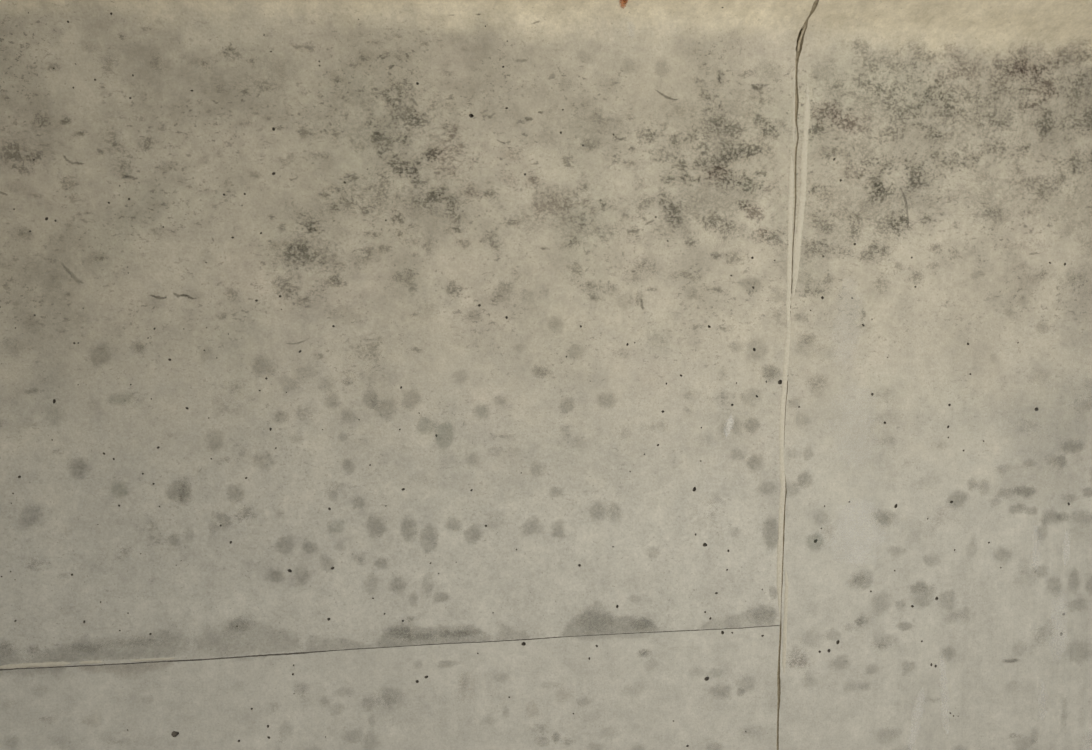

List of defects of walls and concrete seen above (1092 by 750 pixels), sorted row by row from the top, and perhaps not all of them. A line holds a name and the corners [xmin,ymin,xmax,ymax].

crack [0,0,819,750]